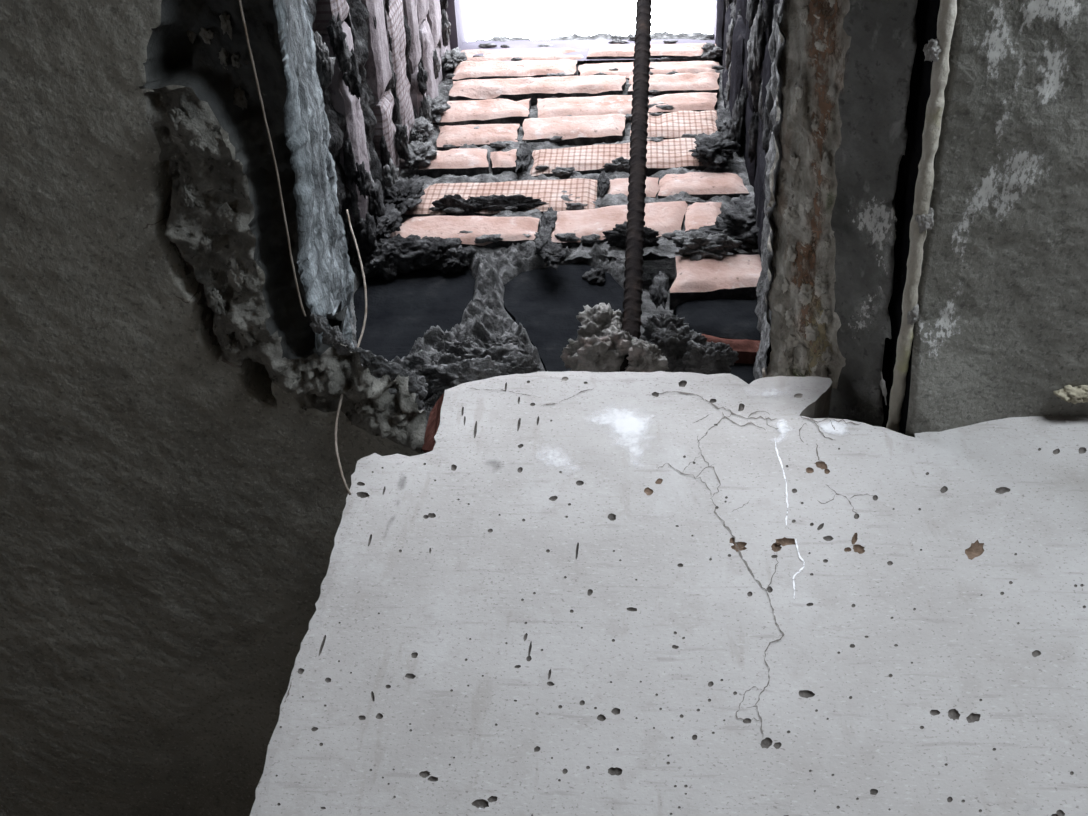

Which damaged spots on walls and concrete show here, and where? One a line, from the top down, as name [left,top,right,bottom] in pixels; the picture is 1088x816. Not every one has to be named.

spalling [139,0,626,454]
spalling [640,0,851,389]
rust [791,0,848,353]
water stain [917,0,1081,357]
crack [659,391,873,733]